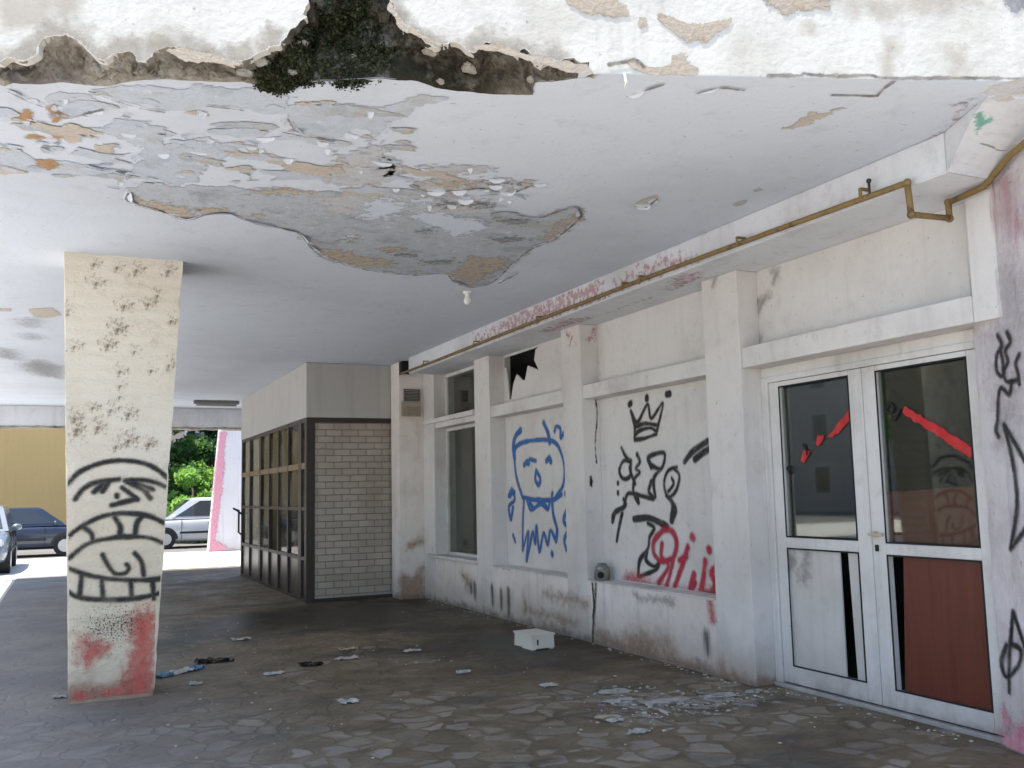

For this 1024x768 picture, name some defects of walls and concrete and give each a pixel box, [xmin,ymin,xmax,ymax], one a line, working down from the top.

peeling [764,0,830,17]
peeling [566,0,732,98]
spalling [0,0,595,288]
peeling [781,107,846,130]
peeling [29,308,61,317]
mould [71,369,138,437]
crack [589,582,597,643]